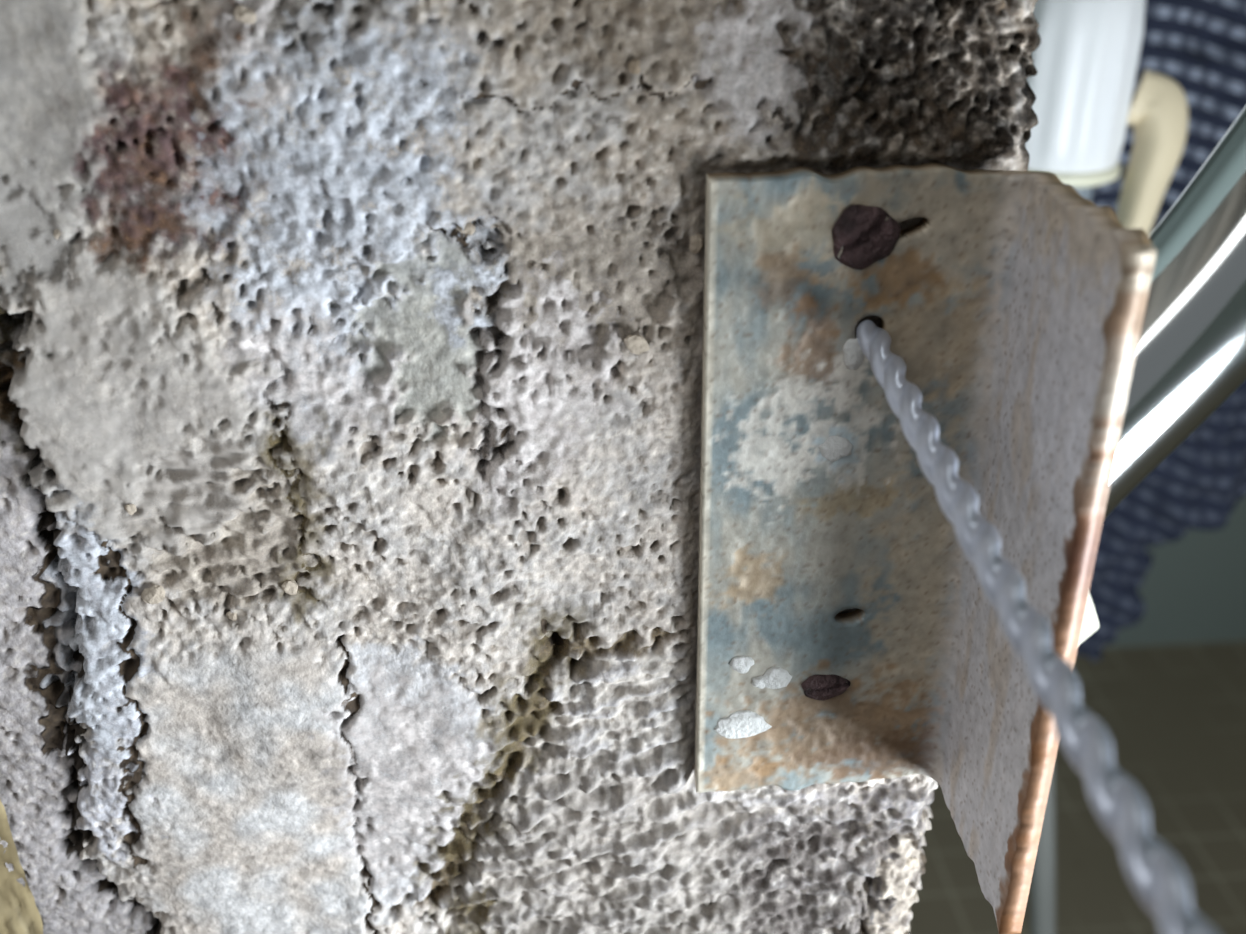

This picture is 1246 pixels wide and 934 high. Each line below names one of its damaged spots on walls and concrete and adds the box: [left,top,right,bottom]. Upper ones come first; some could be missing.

crack [0,310,32,424]
spalling [0,176,68,301]
corrosion [75,0,268,273]
spalling [118,432,303,621]
crack [262,354,322,601]
crack [430,218,511,477]
crack [420,74,713,113]
water stain [695,0,1041,172]
crack [25,449,162,934]
crack [336,634,380,934]
crack [419,619,683,915]
crack [699,835,816,918]